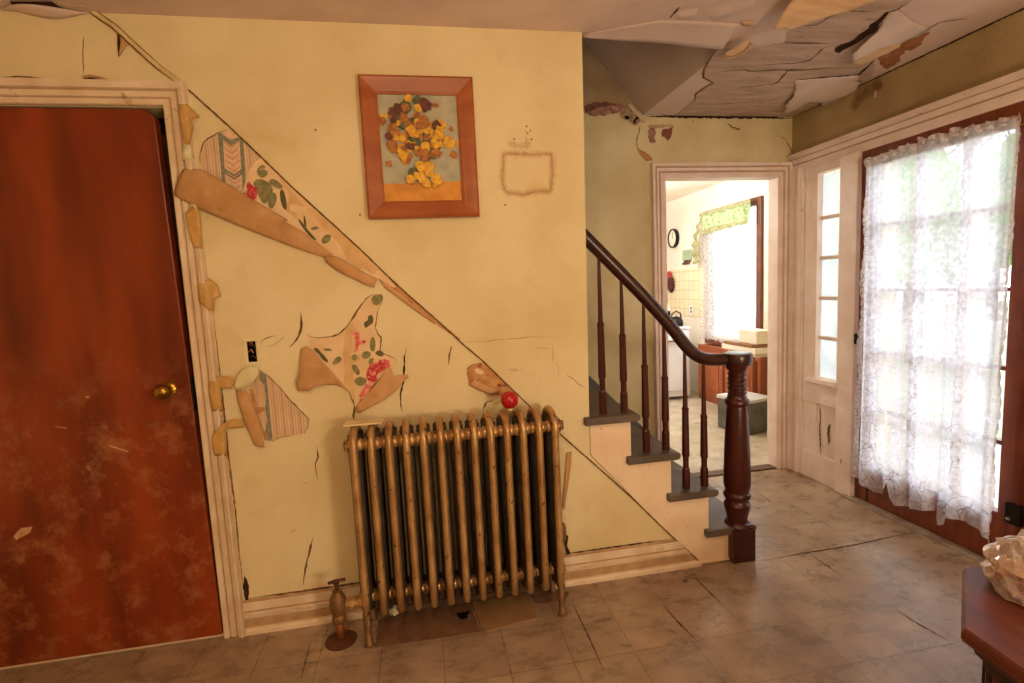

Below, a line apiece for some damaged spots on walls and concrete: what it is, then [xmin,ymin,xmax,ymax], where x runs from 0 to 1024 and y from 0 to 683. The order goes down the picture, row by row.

crack [710,11,868,105]
flaking render [878,32,930,69]
flaking render [583,101,674,143]
crack [82,11,720,603]
crack [819,407,842,462]